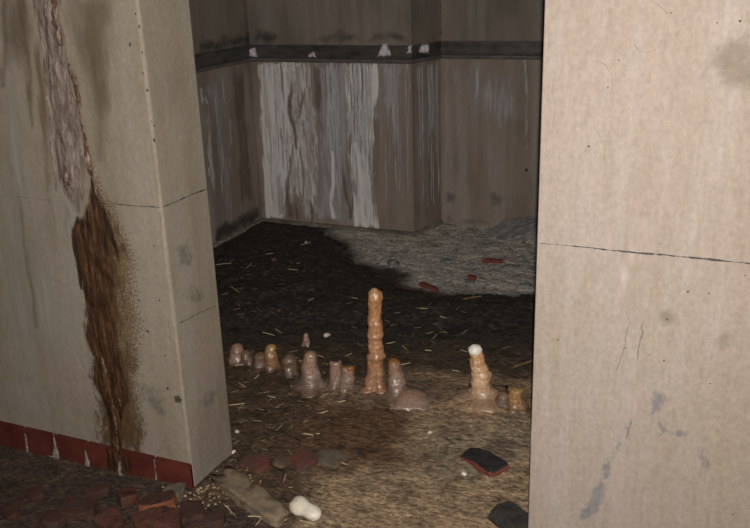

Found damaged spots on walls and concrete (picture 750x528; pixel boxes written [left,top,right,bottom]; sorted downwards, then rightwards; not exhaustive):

rust [72,166,146,476]
crack [100,189,206,208]
damp [200,61,446,240]
crack [540,243,750,264]